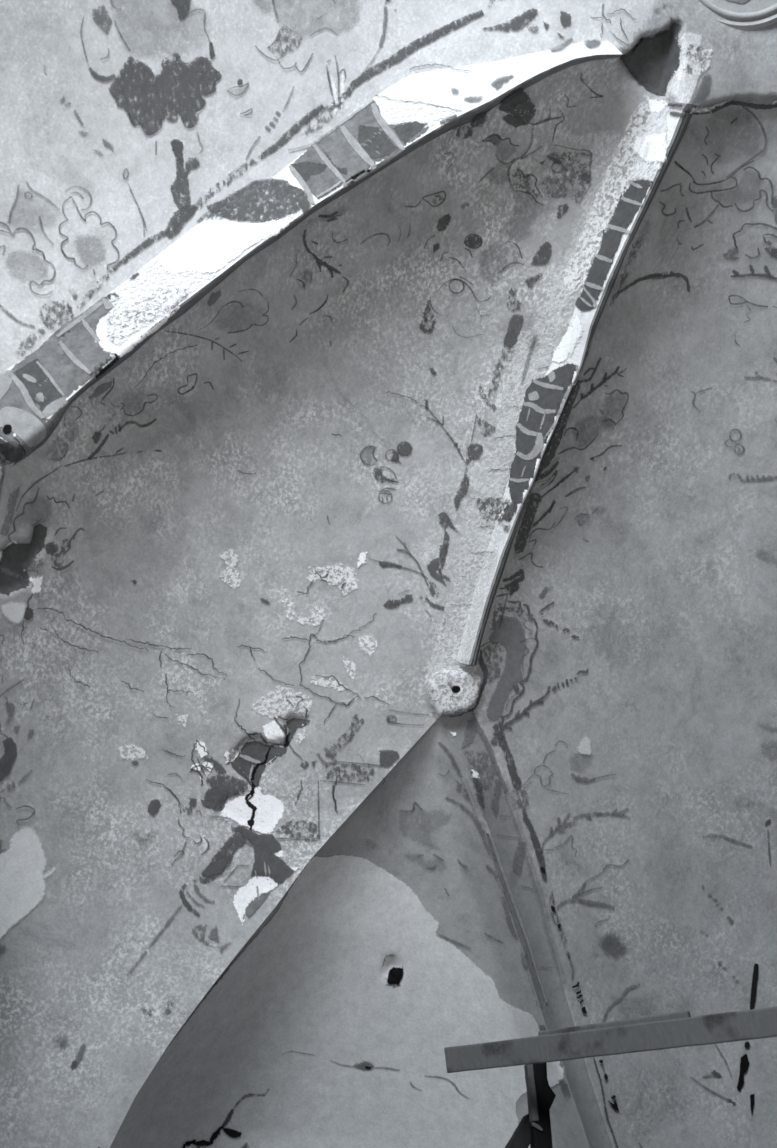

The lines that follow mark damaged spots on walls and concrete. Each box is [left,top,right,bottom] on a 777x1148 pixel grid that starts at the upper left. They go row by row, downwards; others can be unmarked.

flaking render [0,88,481,465]
flaking render [428,23,713,717]
flaking render [0,488,47,644]
crack [38,608,226,718]
flaking render [220,549,241,589]
crack [164,614,388,834]
flaking render [261,589,326,626]
flaking render [251,656,356,744]
flaking render [306,552,368,595]
flaking render [358,634,378,656]
flaking render [379,750,399,767]
crack [183,1089,269,1148]